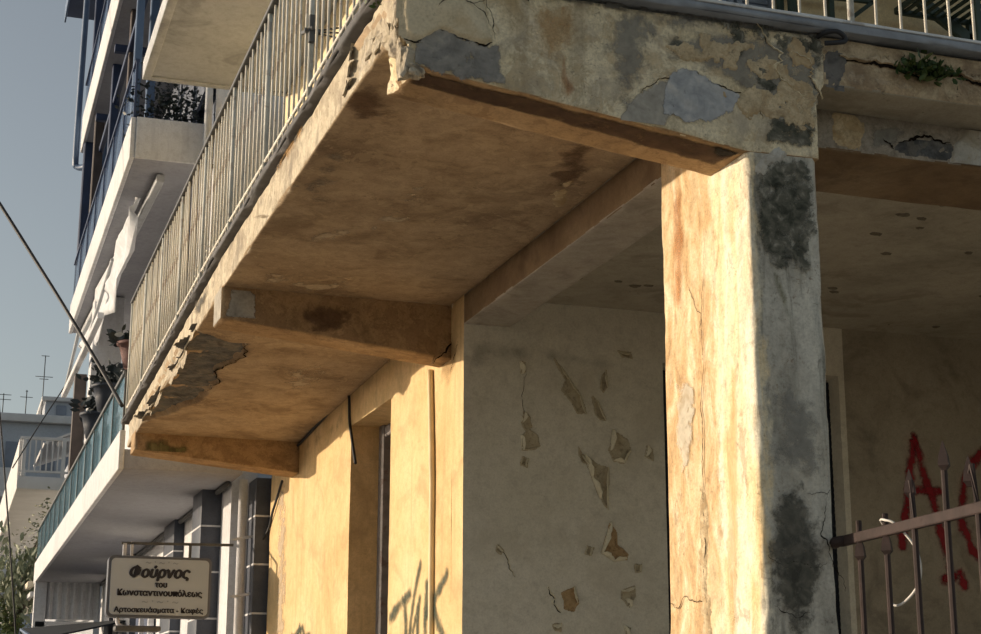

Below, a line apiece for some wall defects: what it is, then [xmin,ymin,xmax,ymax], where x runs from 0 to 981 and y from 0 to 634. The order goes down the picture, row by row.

spalling [354,0,505,84]
flaking render [621,31,847,137]
crack [757,23,824,113]
crack [839,54,981,86]
mould [767,118,816,147]
spalling [883,130,981,166]
mould [757,160,817,296]
spalling [134,287,256,419]
water stain [305,308,347,331]
crack [431,332,458,371]
peeling [554,358,642,573]
water stain [768,395,820,634]